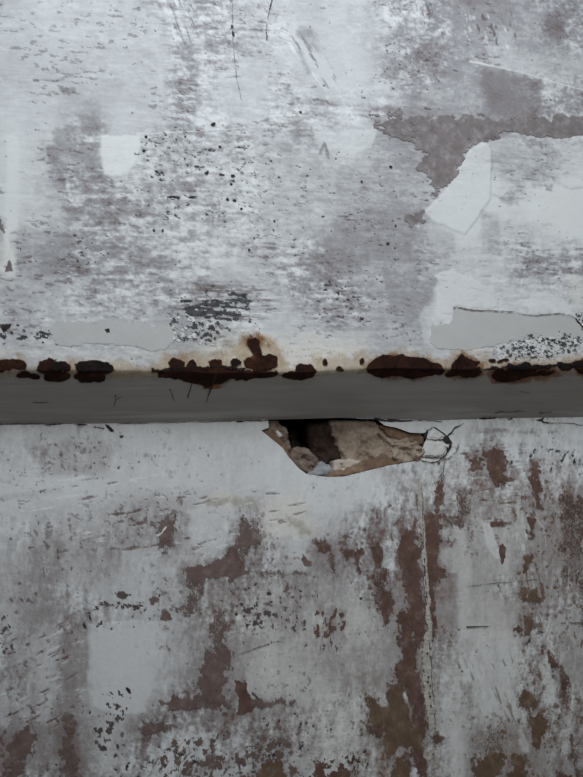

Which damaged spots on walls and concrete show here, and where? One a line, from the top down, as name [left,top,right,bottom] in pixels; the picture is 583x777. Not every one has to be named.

rust [0,334,583,389]
peeling [430,307,583,364]
spalling [261,418,426,477]
crack [374,391,582,478]